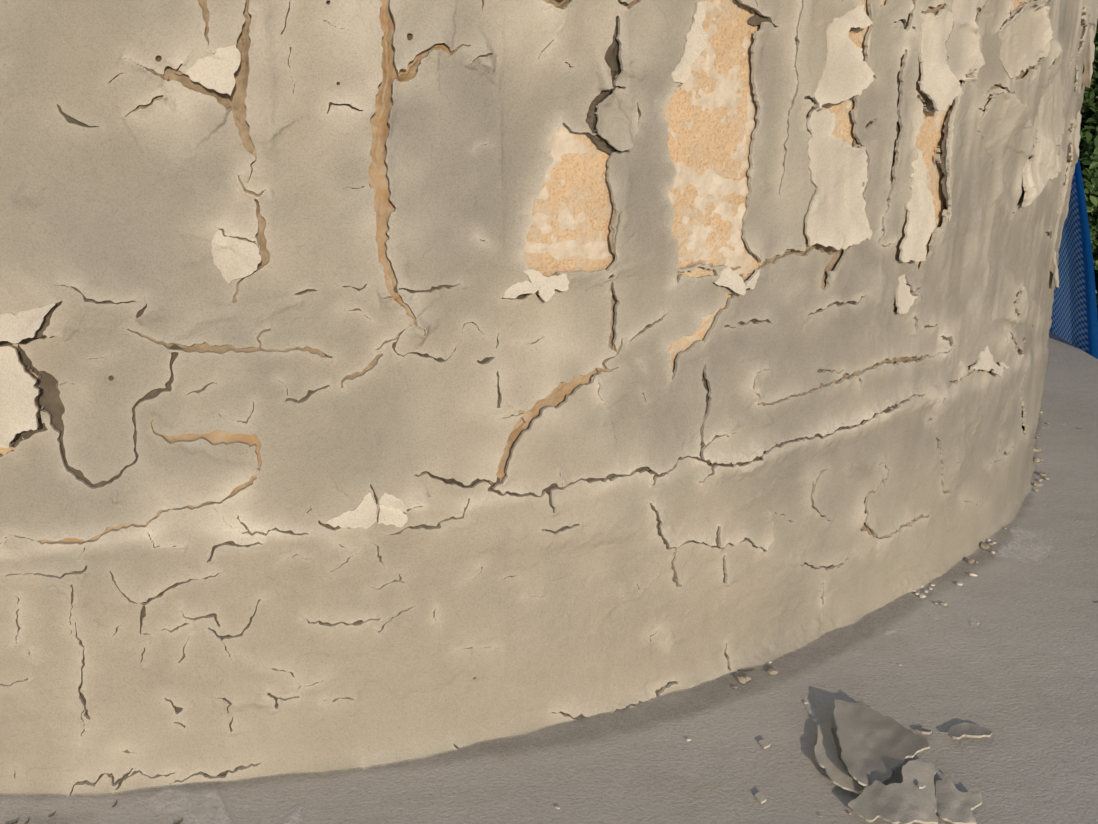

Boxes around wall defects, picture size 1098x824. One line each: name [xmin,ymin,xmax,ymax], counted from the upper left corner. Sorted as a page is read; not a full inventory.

peeling [185,45,241,95]
crack [543,0,569,9]
spalling [502,88,639,302]
crack [586,0,639,155]
spalling [664,0,763,372]
peeling [804,0,887,250]
crack [853,4,945,201]
peeling [895,0,985,314]
crack [982,7,1086,111]
peeling [0,303,56,456]
crack [0,0,492,733]
crack [377,210,952,586]